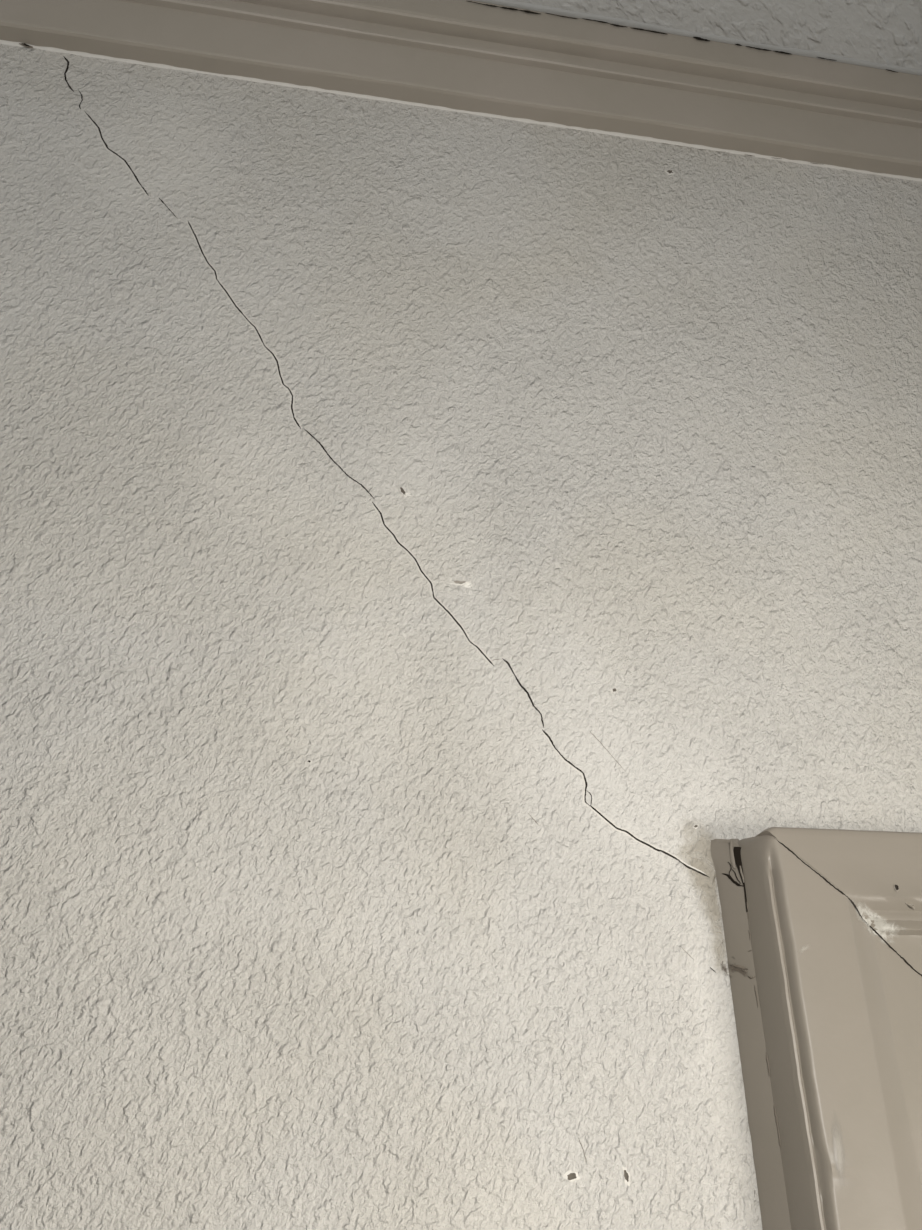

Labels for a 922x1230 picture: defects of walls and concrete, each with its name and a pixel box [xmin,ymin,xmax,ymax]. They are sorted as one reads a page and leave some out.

crack [63,56,751,940]